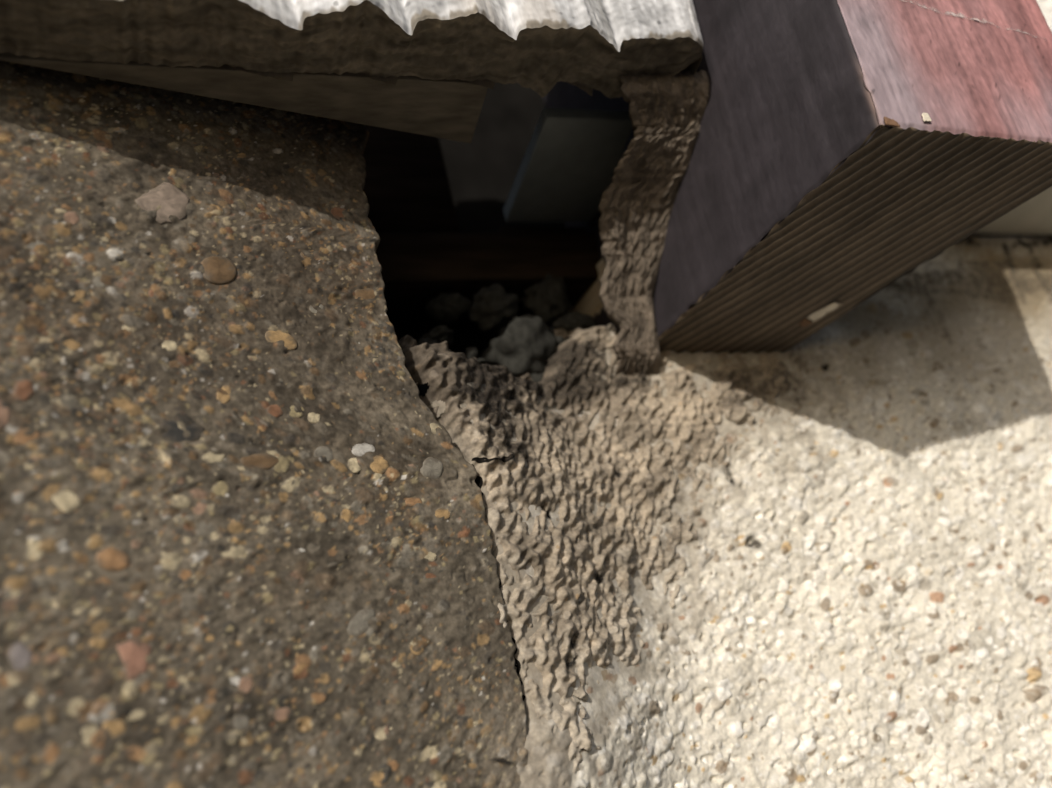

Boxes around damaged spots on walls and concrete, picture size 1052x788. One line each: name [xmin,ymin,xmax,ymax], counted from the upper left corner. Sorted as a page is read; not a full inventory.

damp [449,343,649,464]
crack [471,454,514,510]
crack [507,621,526,701]